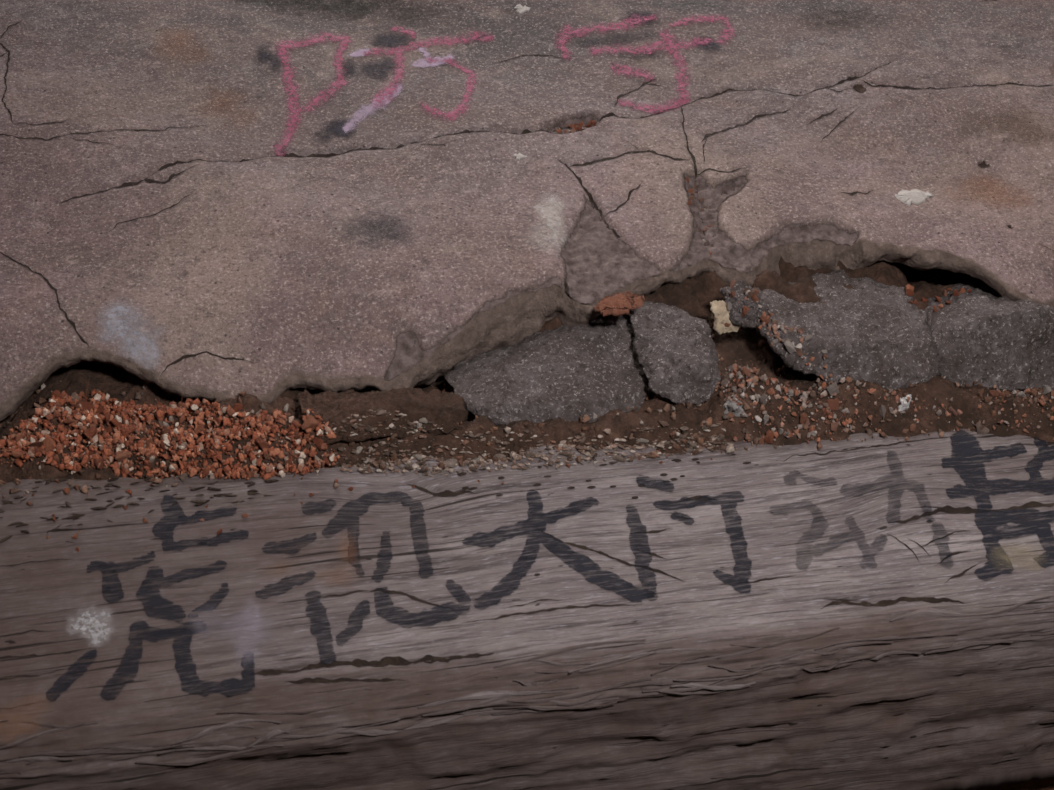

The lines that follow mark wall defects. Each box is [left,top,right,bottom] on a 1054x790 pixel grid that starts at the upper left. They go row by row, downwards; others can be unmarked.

crack [0,19,203,145]
crack [490,54,577,63]
crack [56,127,563,232]
crack [557,61,1052,238]
crack [0,252,89,346]